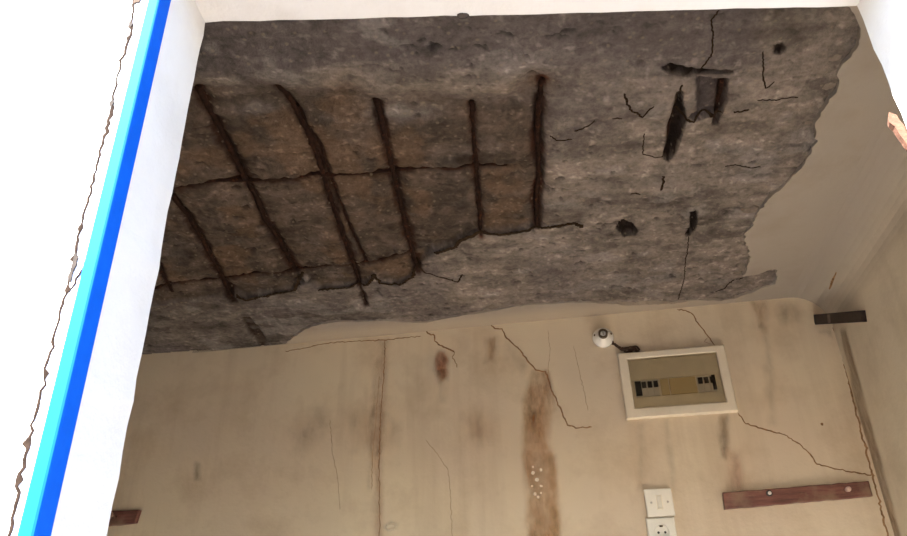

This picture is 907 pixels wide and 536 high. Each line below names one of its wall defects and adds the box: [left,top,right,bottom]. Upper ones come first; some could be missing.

crack [700,10,719,69]
flaking render [142,6,859,354]
crack [550,51,798,195]
crack [677,236,714,345]
crack [286,331,457,533]
rust [437,354,446,378]
crack [491,325,591,429]
crack [738,359,889,536]